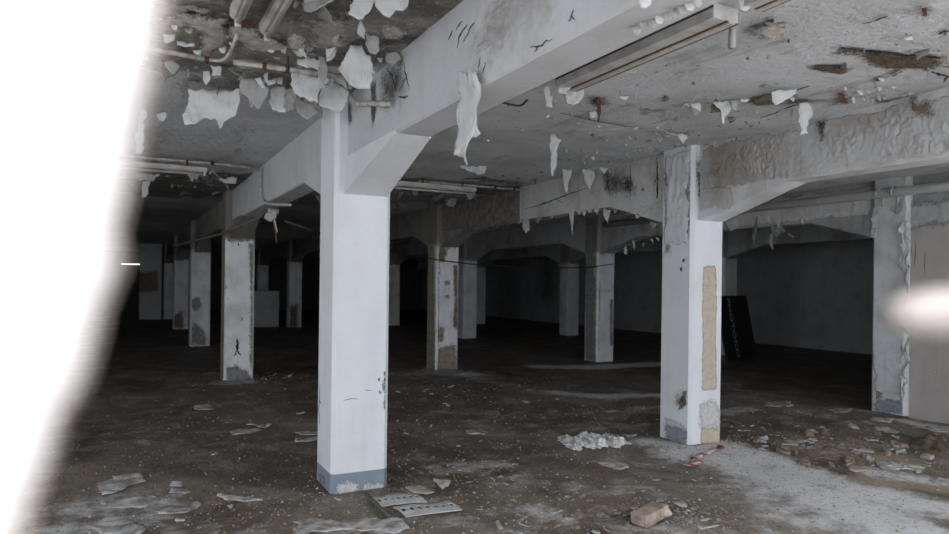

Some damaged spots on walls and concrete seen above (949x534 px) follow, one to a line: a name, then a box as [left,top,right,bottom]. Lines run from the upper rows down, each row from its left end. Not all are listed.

peeling [146,0,409,129]
damp [370,63,405,123]
crack [448,21,475,48]
rust [589,97,609,122]
spalling [390,33,949,233]
peeling [870,199,911,293]
spalling [427,239,458,369]
spalling [699,266,721,444]
peeling [873,334,911,415]
peeling [664,417,687,449]